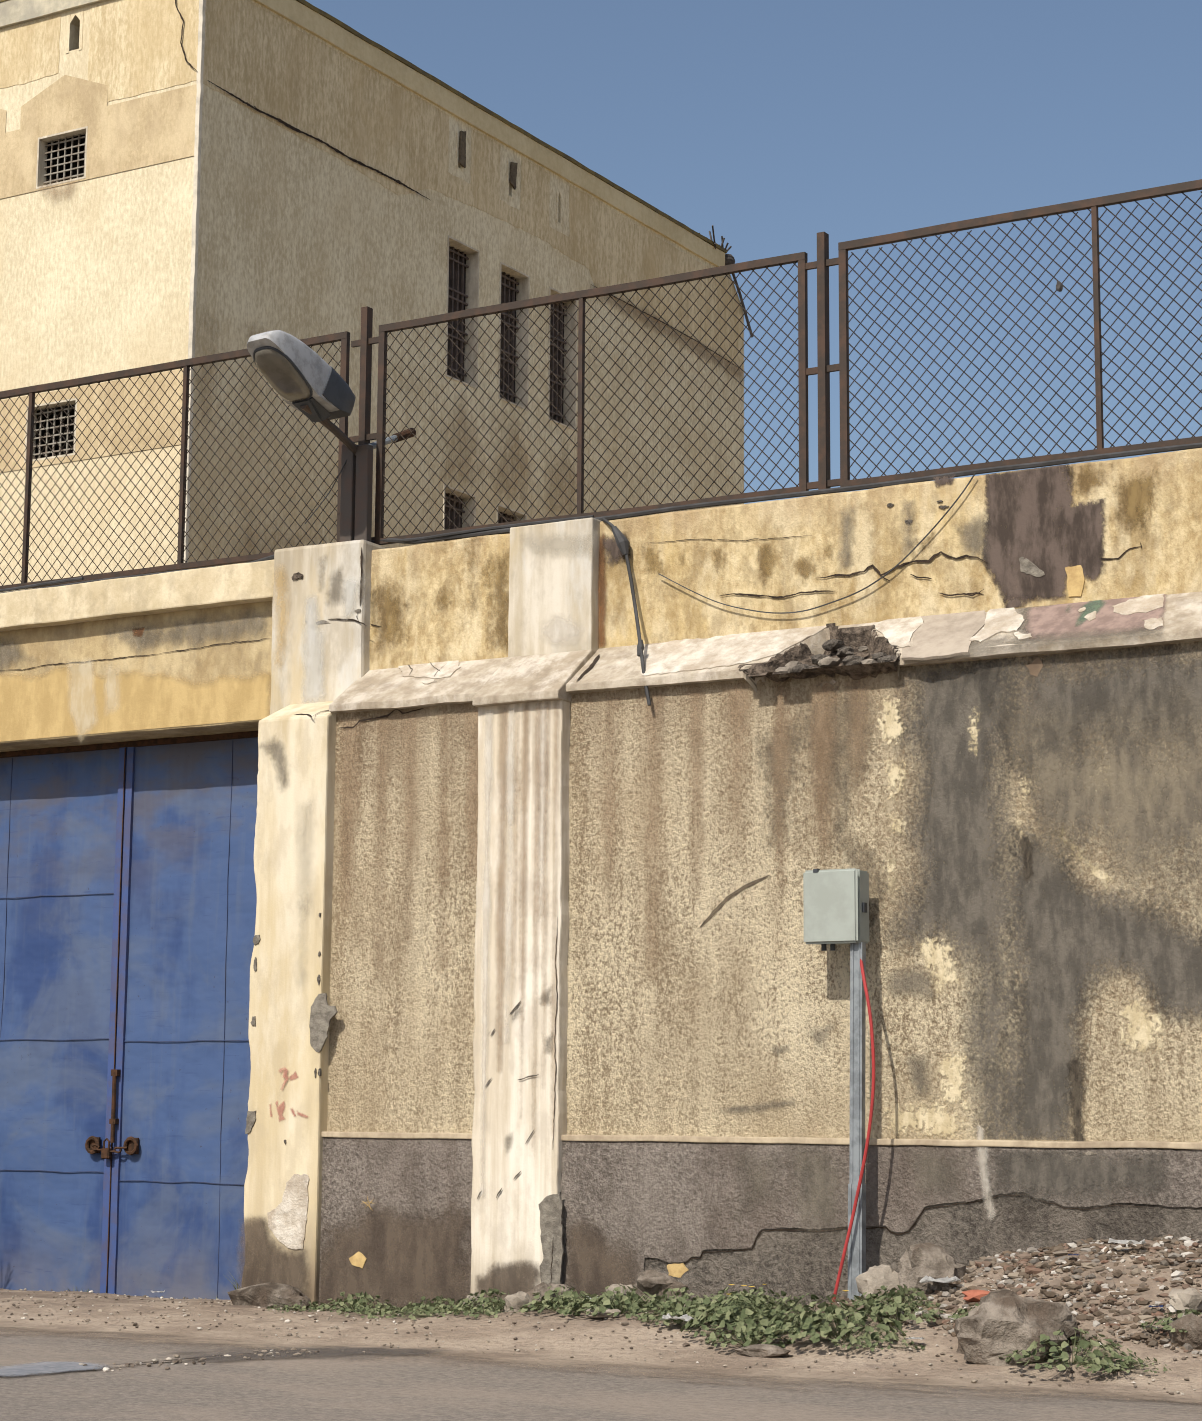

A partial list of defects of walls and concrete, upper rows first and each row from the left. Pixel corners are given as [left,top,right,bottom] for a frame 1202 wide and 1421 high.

crack [175,0,430,200]
crack [0,638,268,671]
water stain [758,545,774,584]
spalling [641,616,923,682]
water stain [796,558,813,577]
crack [720,551,988,598]
peeling [969,607,1033,643]
peeling [1065,565,1164,630]
water stain [759,689,881,925]
water stain [888,463,1202,1203]
spalling [309,975,338,1078]
crack [658,1194,1163,1264]